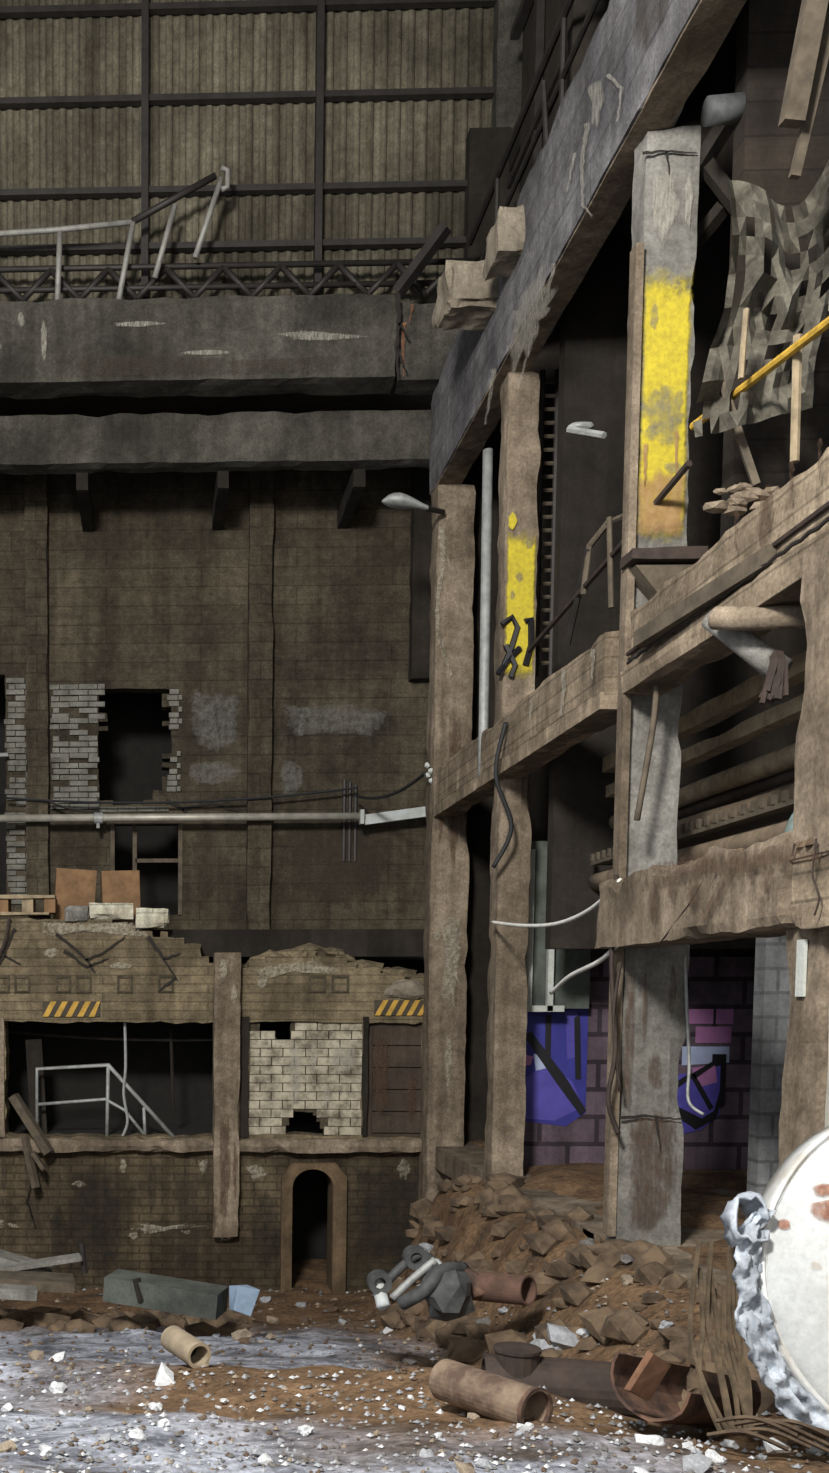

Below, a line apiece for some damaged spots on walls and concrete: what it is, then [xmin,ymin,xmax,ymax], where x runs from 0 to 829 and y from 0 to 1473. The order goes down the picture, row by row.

spalling [4,678,27,904]
spalling [49,684,234,812]